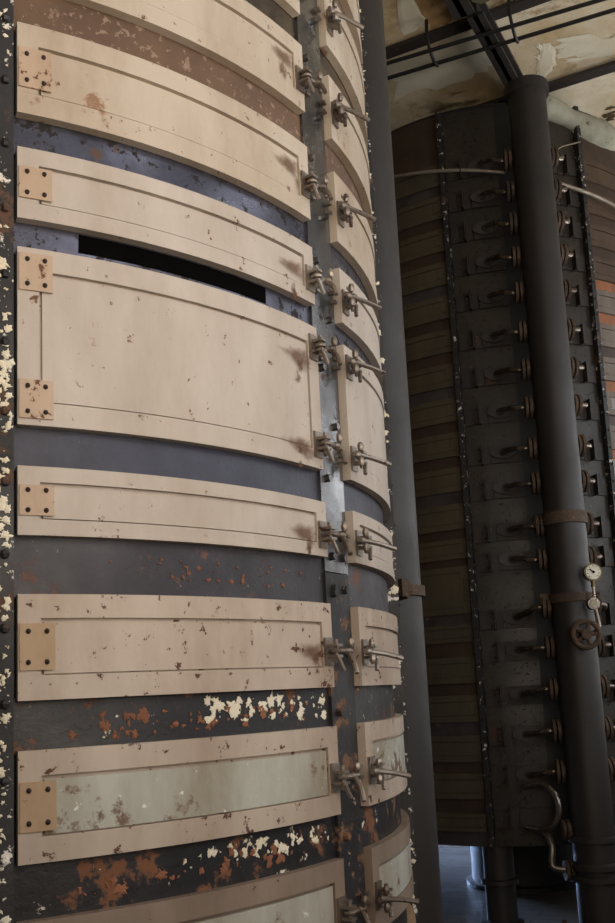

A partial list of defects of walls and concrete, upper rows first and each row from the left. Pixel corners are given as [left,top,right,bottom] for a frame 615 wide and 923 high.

flaking render [534,34,615,78]
peeling [90,693,327,740]
peeling [149,825,329,881]
peeling [105,871,128,895]